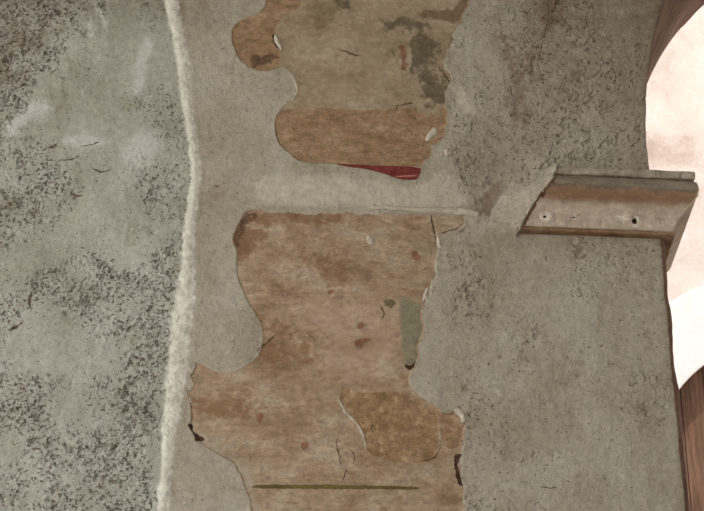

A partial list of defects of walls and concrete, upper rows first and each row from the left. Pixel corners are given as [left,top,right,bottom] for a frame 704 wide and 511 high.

flaking render [231,0,471,167]
water stain [373,0,580,140]
crack [430,214,464,245]
flaking render [186,208,467,511]